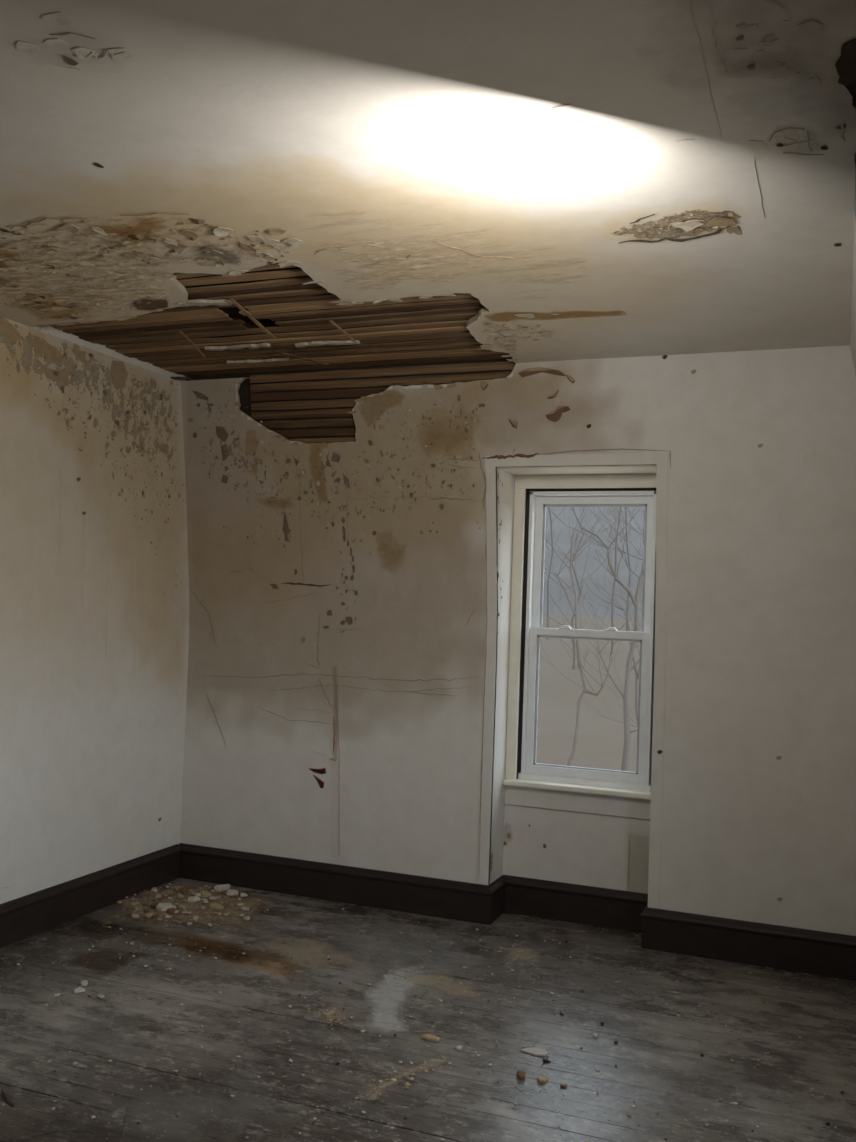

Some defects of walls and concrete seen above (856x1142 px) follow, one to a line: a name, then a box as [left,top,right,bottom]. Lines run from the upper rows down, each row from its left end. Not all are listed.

leakage [0,213,302,320]
flaking render [613,210,741,244]
flaking render [0,261,575,557]
leakage [323,517,358,631]